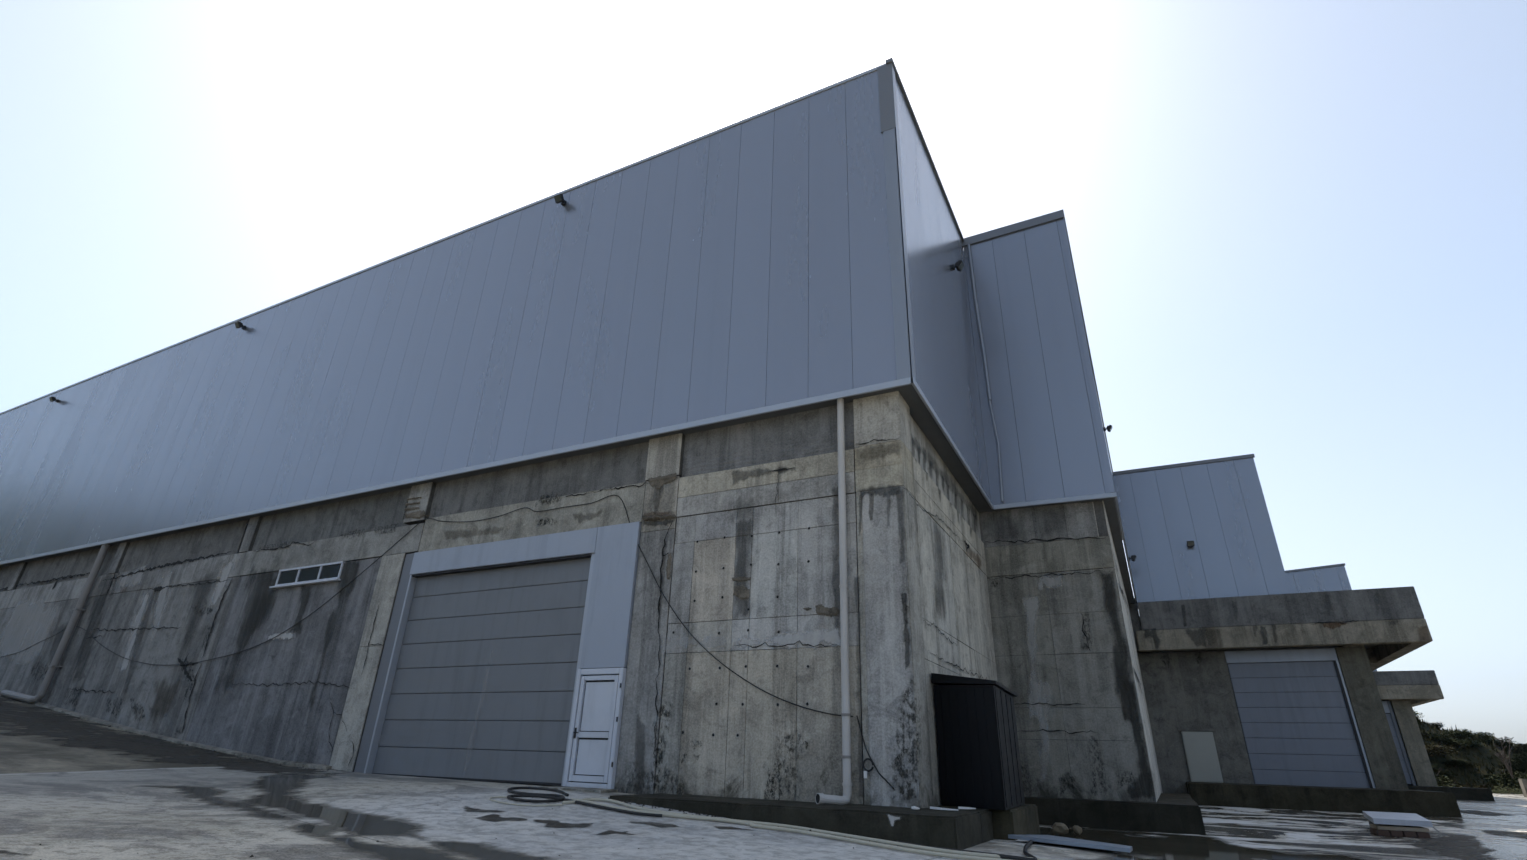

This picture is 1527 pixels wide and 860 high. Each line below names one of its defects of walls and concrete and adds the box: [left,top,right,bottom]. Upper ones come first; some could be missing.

damp [860,486,900,497]
damp [120,567,169,671]
damp [193,562,233,614]
damp [892,593,920,800]
damp [1059,572,1153,798]